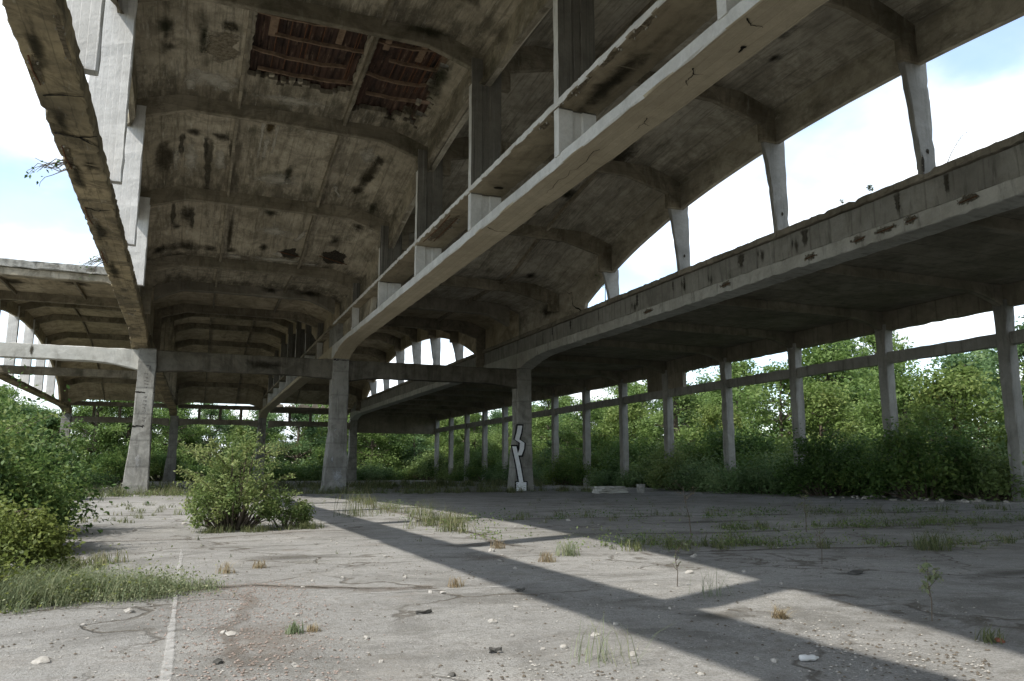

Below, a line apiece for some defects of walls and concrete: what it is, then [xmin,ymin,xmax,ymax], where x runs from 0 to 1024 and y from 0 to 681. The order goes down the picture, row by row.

leakage [27,34,44,68]
leakage [157,129,232,187]
leakage [346,149,384,193]
leakage [171,204,195,228]
spalling [277,248,299,258]
spalling [320,250,347,265]